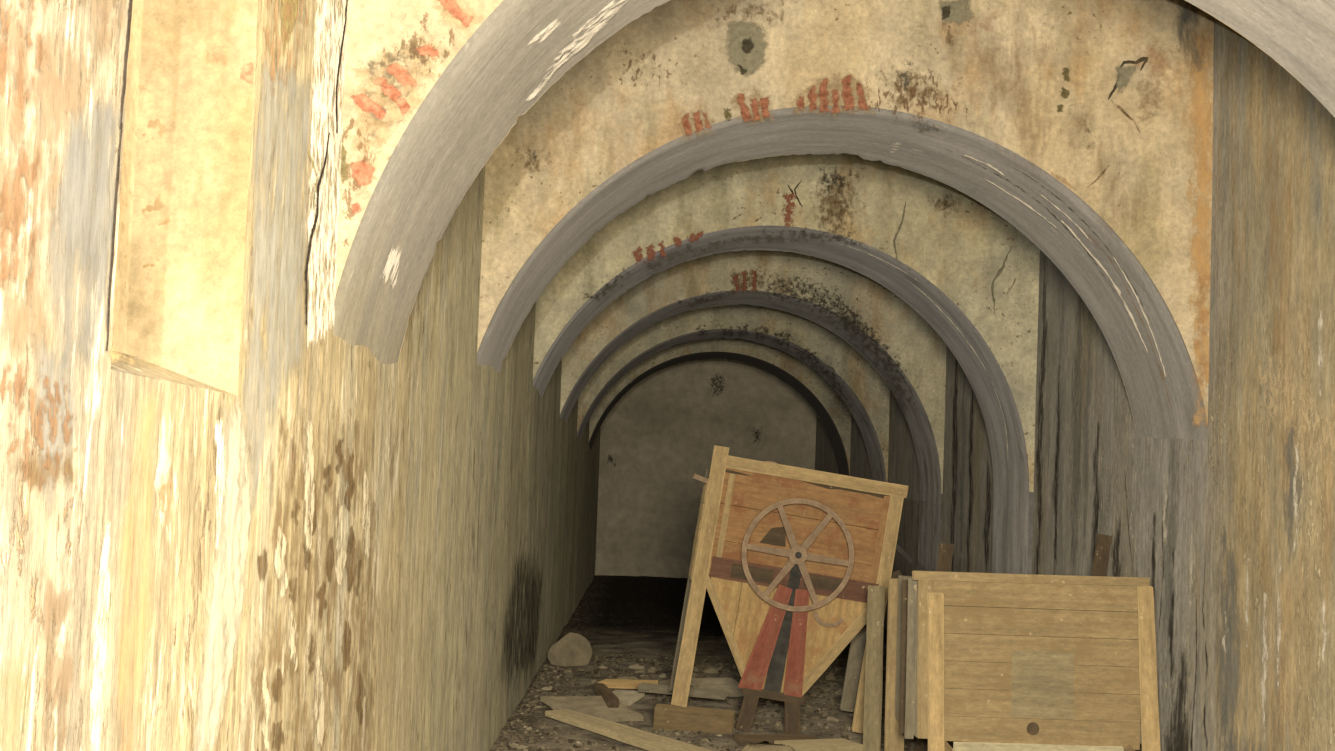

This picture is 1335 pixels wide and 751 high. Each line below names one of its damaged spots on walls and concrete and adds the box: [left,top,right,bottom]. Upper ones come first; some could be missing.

flaking render [527,0,629,101]
flaking render [682,90,770,136]
flaking render [724,6,768,76]
flaking render [795,75,870,113]
flaking render [1108,57,1158,132]
peeling [263,0,473,348]
flaking render [587,230,1008,456]
water stain [1287,430,1300,551]
water stain [1152,445,1281,751]